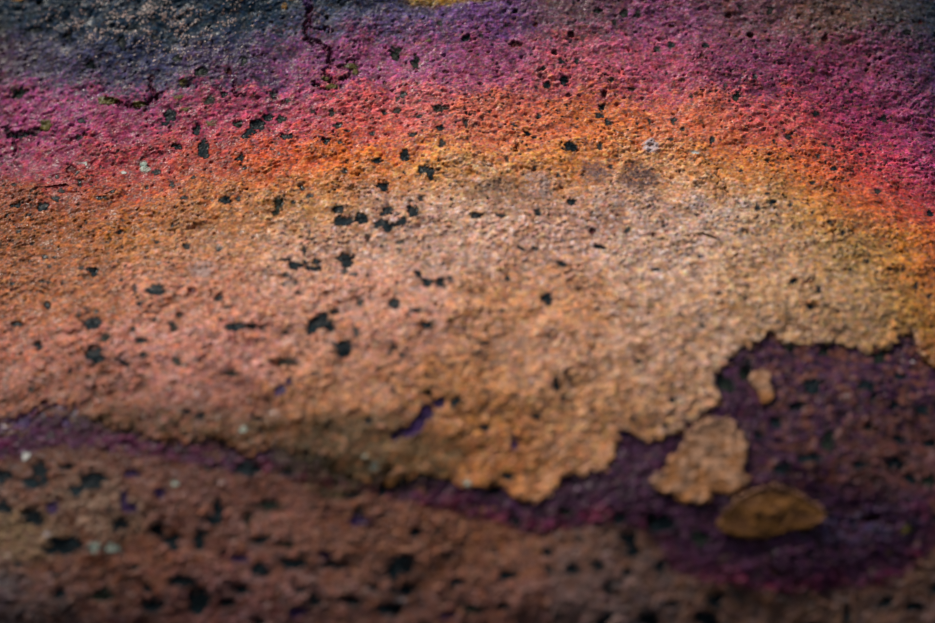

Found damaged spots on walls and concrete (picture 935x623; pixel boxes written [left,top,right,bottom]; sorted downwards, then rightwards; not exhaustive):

peeling [368,81,418,146]
peeling [665,117,722,165]
peeling [808,77,892,131]
peeling [809,133,913,213]
peeling [865,20,935,126]